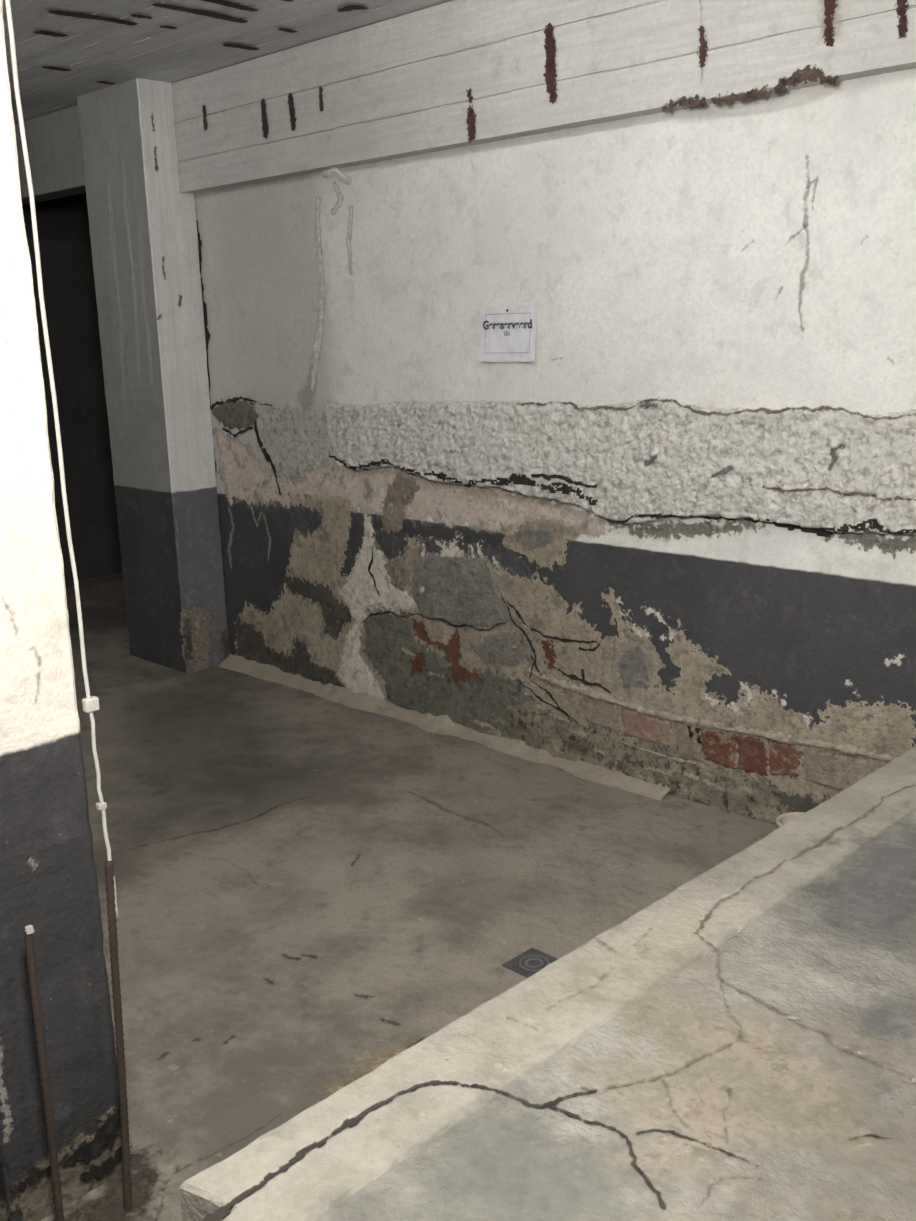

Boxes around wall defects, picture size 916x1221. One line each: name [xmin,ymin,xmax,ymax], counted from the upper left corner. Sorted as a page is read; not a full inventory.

rust [48,0,258,29]
rust [822,0,838,47]
rust [894,0,909,38]
rust [543,22,558,105]
rust [260,98,269,139]
rust [287,93,297,131]
rust [466,89,477,143]
peeling [173,396,916,824]
crack [202,785,916,1221]
spalling [0,861,132,1221]